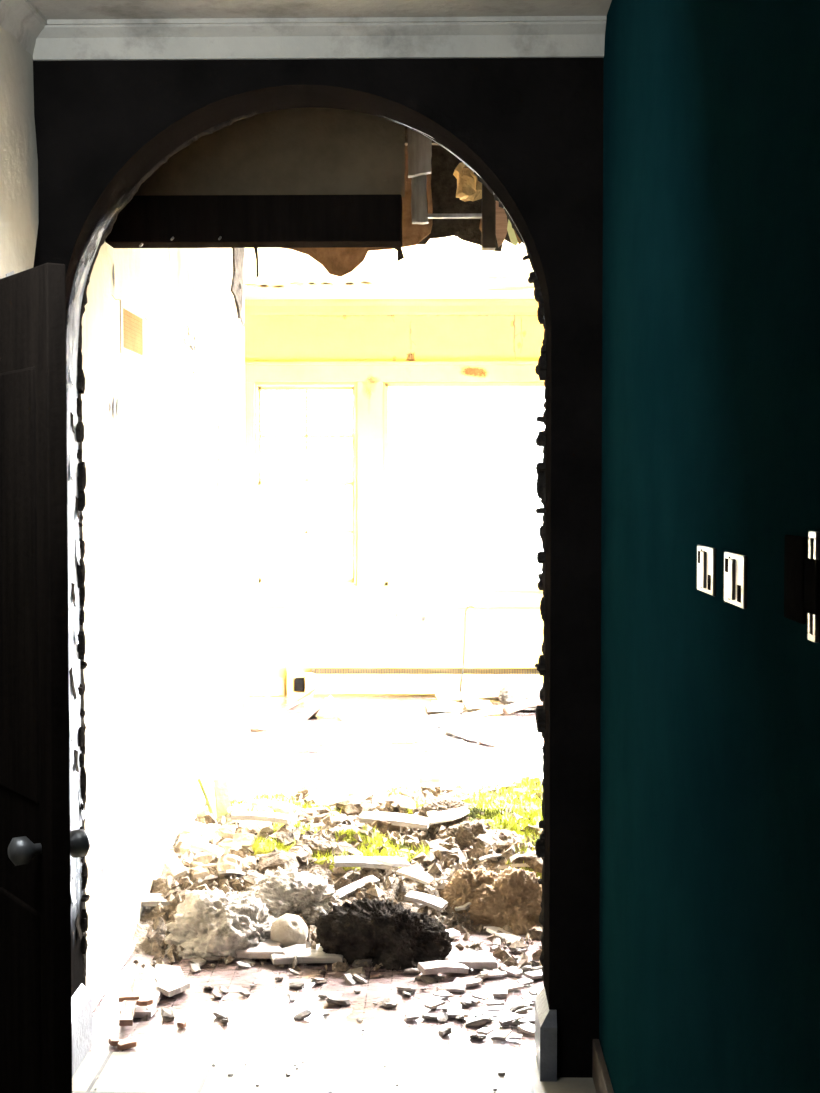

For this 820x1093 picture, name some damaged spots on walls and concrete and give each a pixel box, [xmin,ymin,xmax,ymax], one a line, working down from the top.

crack [85,591,245,655]